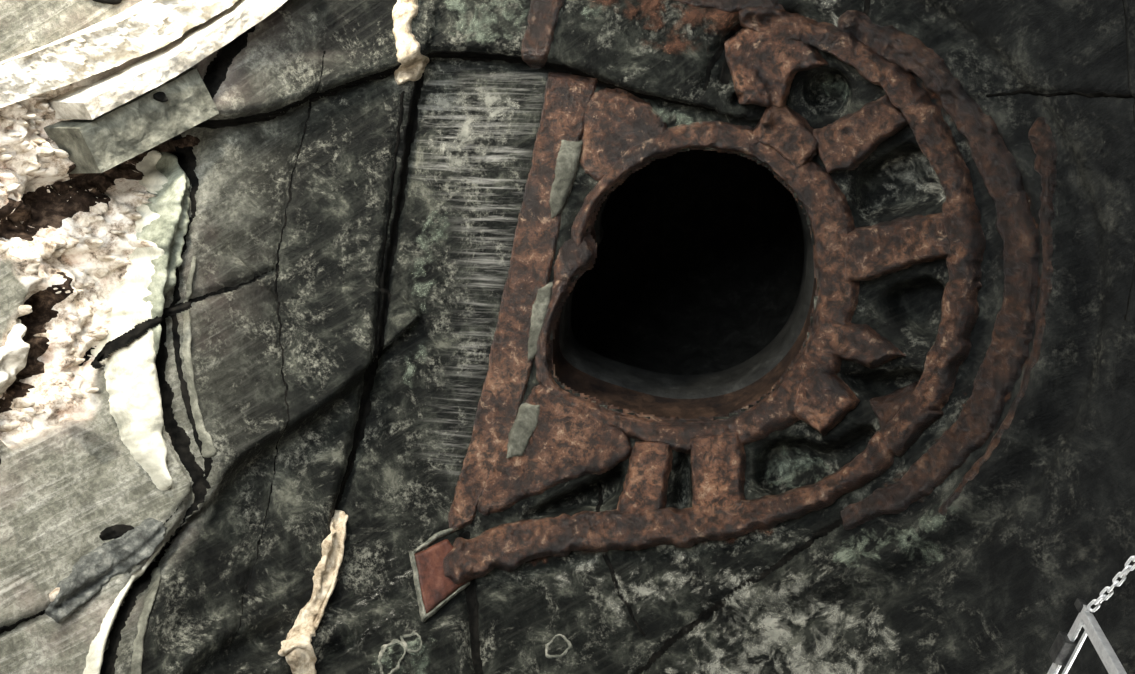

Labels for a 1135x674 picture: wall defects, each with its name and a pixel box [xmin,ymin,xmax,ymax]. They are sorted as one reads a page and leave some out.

spalling [153,92,168,103]
crack [986,0,1135,122]
spalling [0,95,200,432]
crack [78,346,97,366]
crack [100,23,743,674]
crack [0,610,45,634]